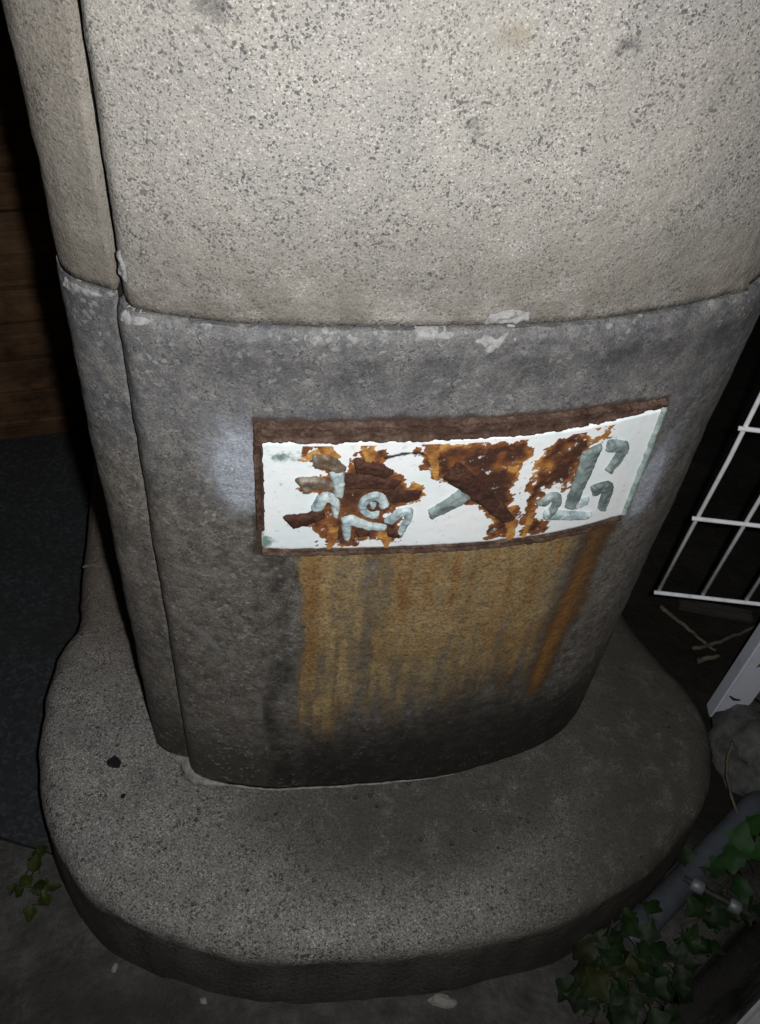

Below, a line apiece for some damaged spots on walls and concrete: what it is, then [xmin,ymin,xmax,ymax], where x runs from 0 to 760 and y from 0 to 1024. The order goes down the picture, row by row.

spalling [414,326,455,342]
spalling [475,310,532,356]
rust [295,424,616,734]